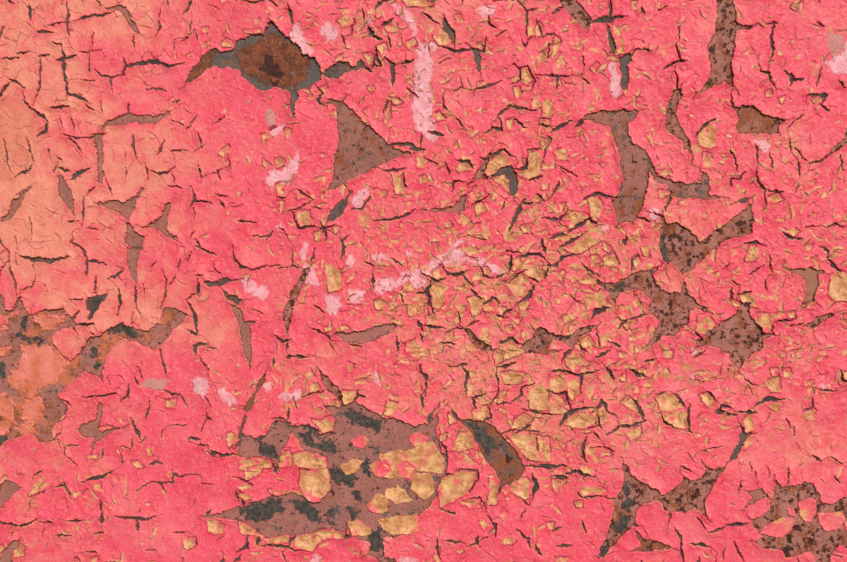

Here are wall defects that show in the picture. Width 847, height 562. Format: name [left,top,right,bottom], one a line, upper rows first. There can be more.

crack [0,0,349,376]
corrosion [186,50,218,83]
corrosion [234,31,311,90]
peeling [185,21,429,190]
crack [342,0,418,113]
crack [384,0,693,562]
peeling [546,87,794,392]
crack [758,21,845,111]
crack [0,349,236,561]
peeling [204,258,641,562]
peeling [598,415,756,558]
peeling [744,481,847,562]